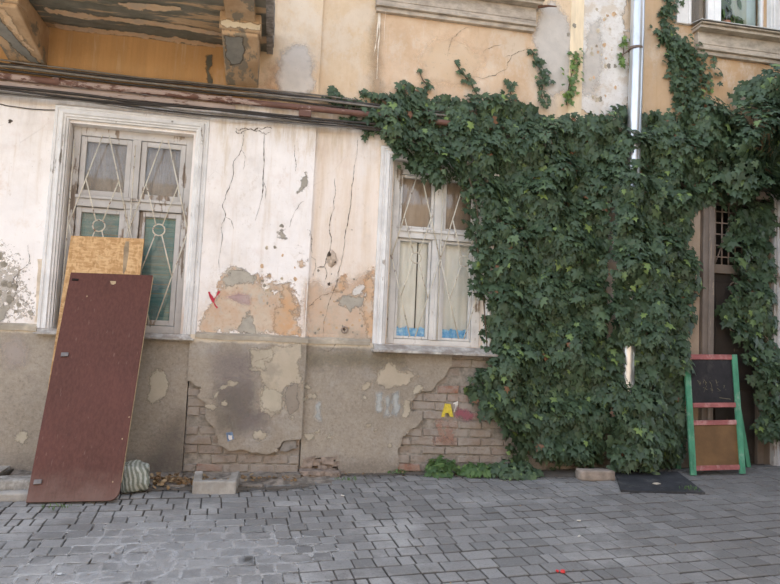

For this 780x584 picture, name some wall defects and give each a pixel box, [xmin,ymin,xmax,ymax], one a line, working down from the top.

flaking render [0,8,41,64]
flaking render [44,2,261,66]
flaking render [533,0,630,116]
peeling [28,259,42,322]
flaking render [187,380,239,416]
crack [218,127,272,263]
flaking render [182,426,345,473]
flaking render [199,260,375,420]
crack [290,140,358,352]
flaking render [362,355,612,473]